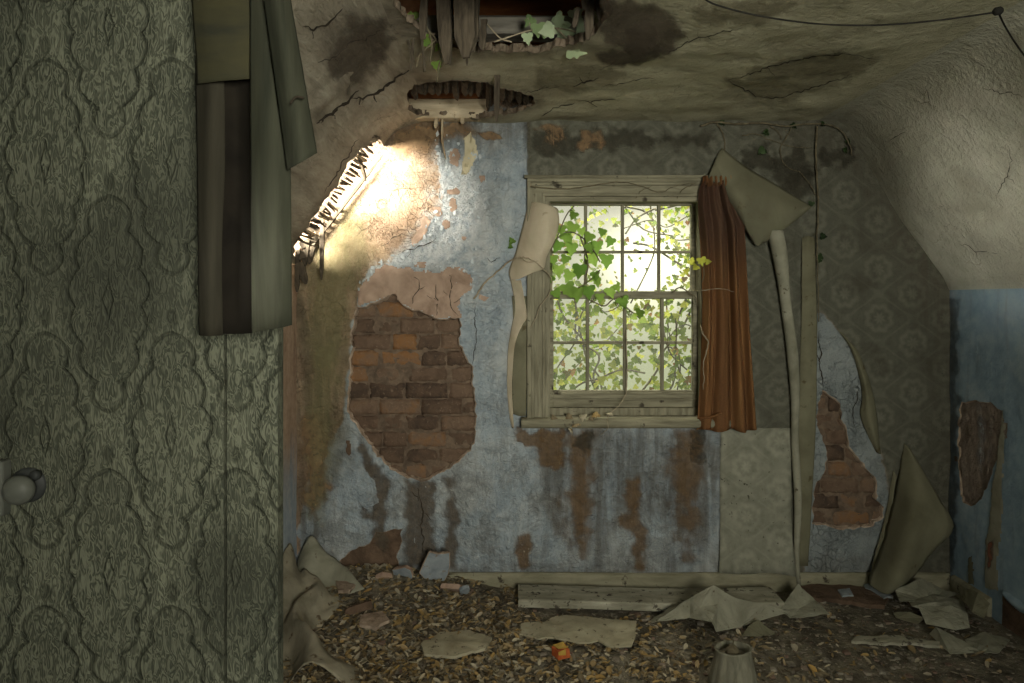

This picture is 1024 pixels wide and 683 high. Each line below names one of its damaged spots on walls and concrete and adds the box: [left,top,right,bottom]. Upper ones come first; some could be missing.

crack [303,9,342,63]
water stain [328,17,396,83]
water stain [597,0,685,66]
crack [316,70,409,124]
spalling [347,130,502,481]
spalling [769,230,884,585]
corrosion [516,534,532,569]
corrosion [517,428,593,557]
corrosion [620,478,647,571]
spalling [956,400,1024,639]